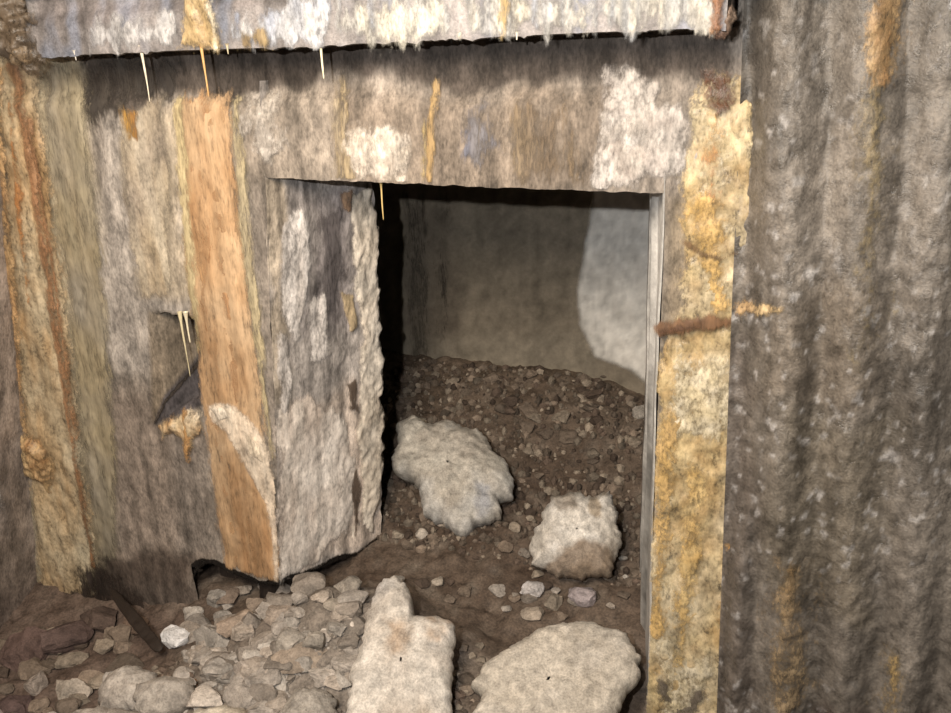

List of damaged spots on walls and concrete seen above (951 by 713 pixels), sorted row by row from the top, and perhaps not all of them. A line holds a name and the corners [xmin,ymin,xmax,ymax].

leakage [231,0,714,50]
corrosion [710,0,736,38]
corrosion [863,0,901,86]
corrosion [422,78,440,182]
leakage [686,184,729,314]
corrosion [172,91,279,581]